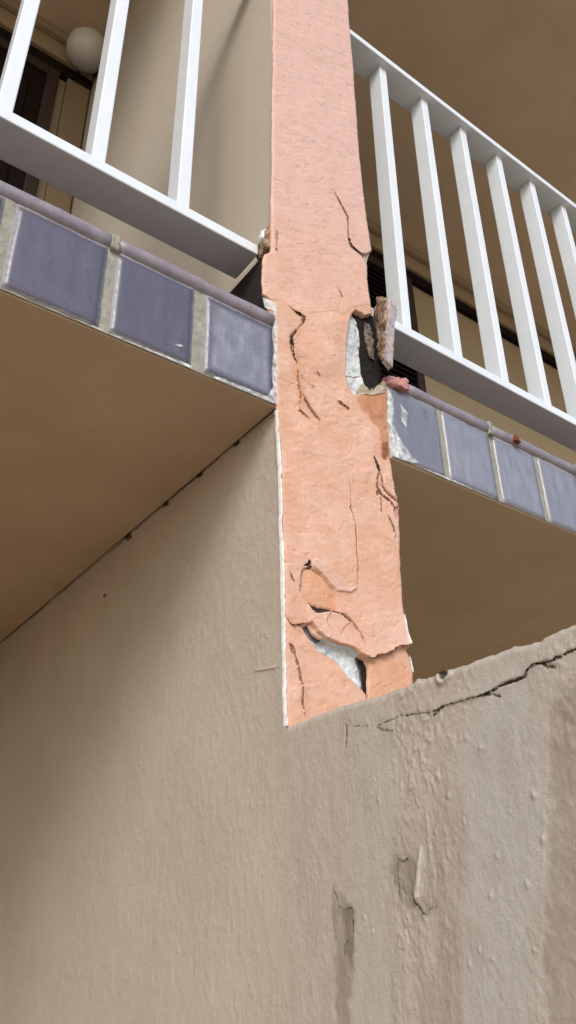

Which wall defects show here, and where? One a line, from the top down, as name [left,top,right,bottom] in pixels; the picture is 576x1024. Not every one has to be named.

crack [333,189,370,266]
crack [289,307,306,363]
spalling [345,314,387,396]
crack [254,605,351,714]
spalling [290,559,414,696]
crack [377,648,576,732]